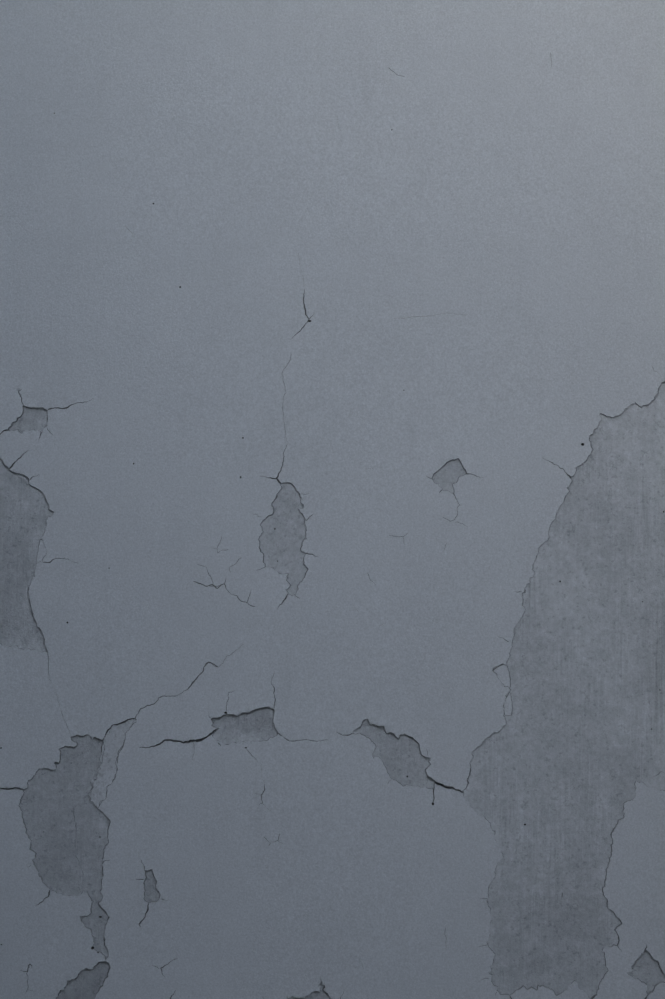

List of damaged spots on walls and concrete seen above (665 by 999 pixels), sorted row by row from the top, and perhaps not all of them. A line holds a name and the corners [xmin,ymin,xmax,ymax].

crack [282,254,314,437]
peeling [0,450,77,653]
peeling [256,445,317,607]
peeling [428,458,484,505]
peeling [19,734,110,999]
peeling [136,859,167,927]
crack [99,645,242,806]
peeling [208,675,278,748]
peeling [352,719,435,802]
crack [435,782,463,793]
peeling [462,382,665,999]
peeling [288,981,345,999]